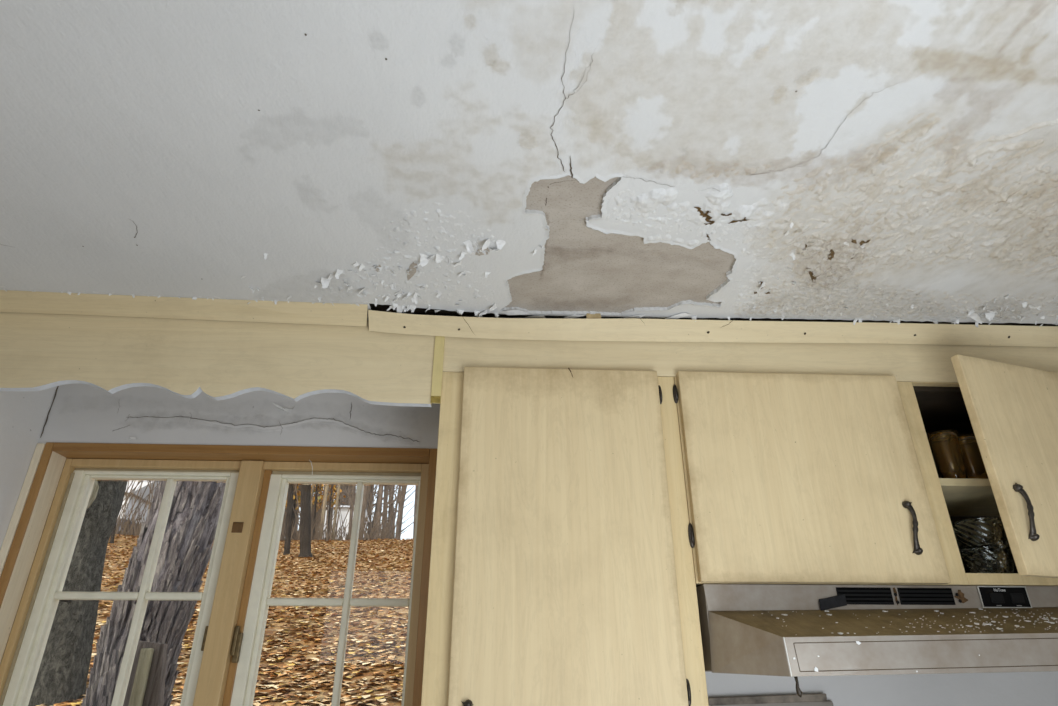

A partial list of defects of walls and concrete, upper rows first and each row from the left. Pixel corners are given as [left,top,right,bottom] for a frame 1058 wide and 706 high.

crack [545,7,593,205]
peeling [179,171,1058,328]
crack [113,402,420,447]